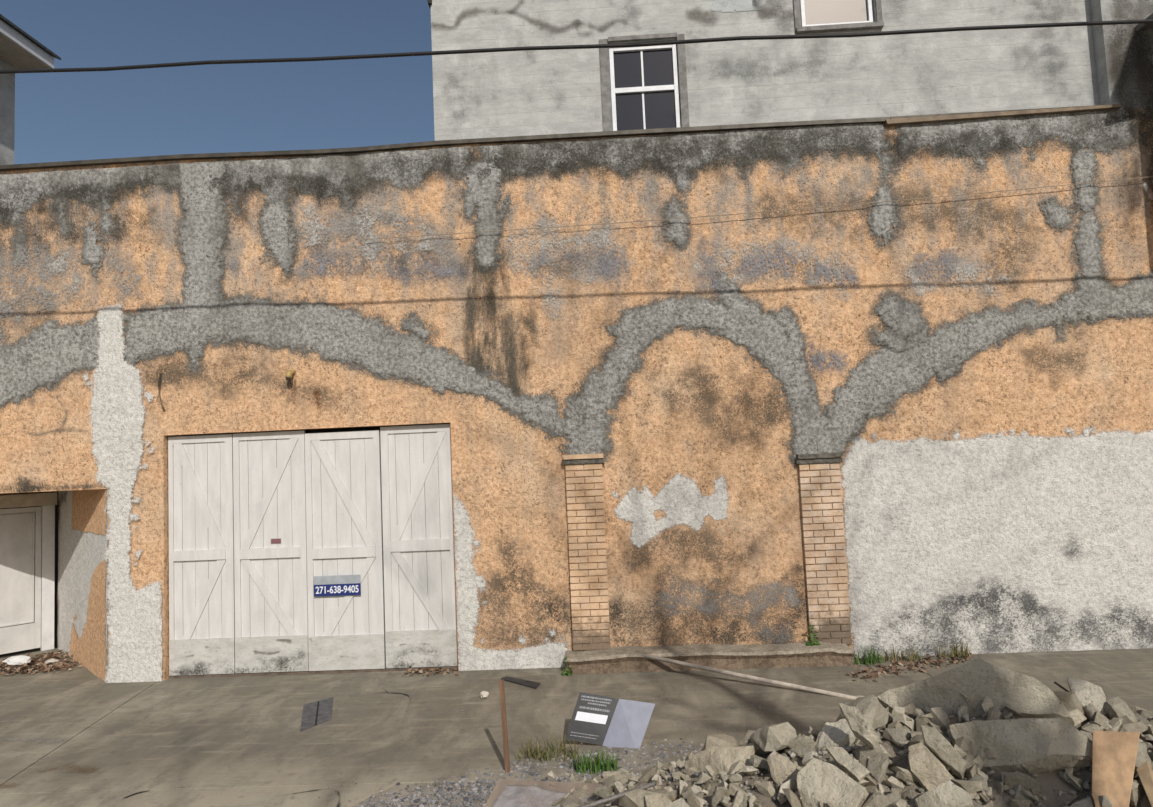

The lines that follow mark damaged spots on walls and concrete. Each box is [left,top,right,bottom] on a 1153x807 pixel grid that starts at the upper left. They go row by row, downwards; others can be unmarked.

crack [433,11,476,27]
crack [530,19,613,32]
leakage [1063,0,1153,190]
leakage [467,127,1051,179]
leakage [0,173,159,254]
leakage [210,154,453,246]
leakage [354,206,433,271]
leakage [757,195,874,233]
leakage [891,189,1035,291]
leakage [467,260,535,395]
peeling [0,107,1153,683]
leakage [866,583,1153,656]